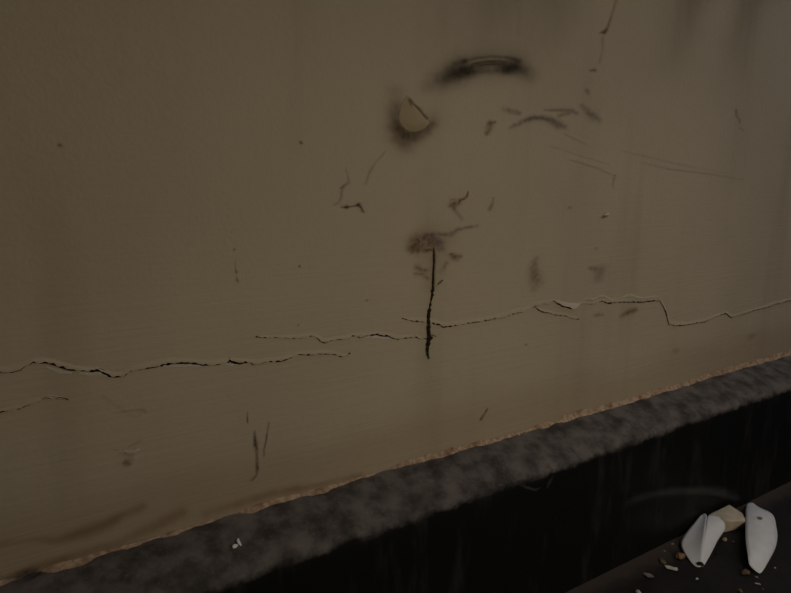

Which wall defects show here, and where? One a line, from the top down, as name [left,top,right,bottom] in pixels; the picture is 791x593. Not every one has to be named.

crack [0,250,791,378]